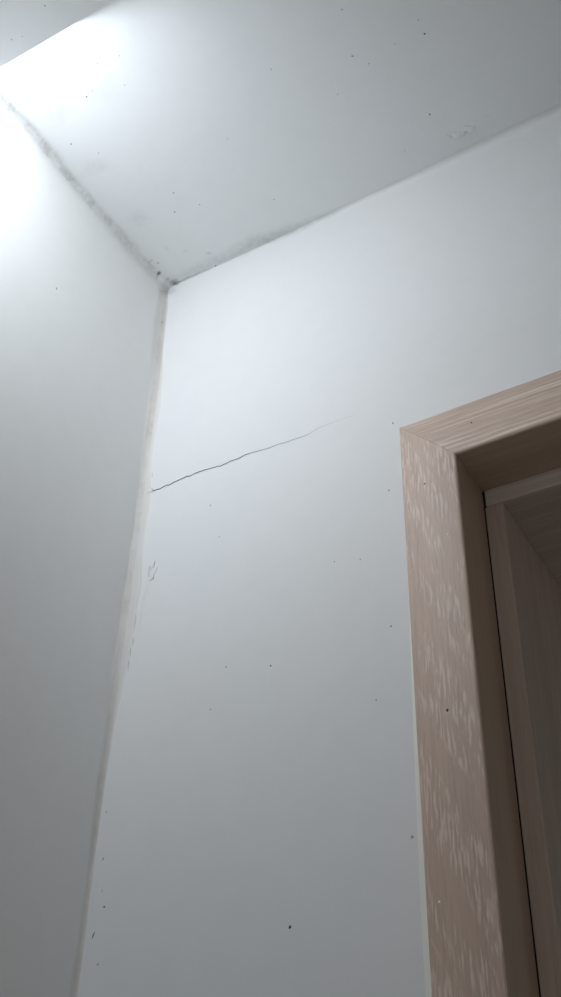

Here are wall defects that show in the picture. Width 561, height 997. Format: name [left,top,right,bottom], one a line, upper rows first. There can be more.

crack [153,446,273,491]